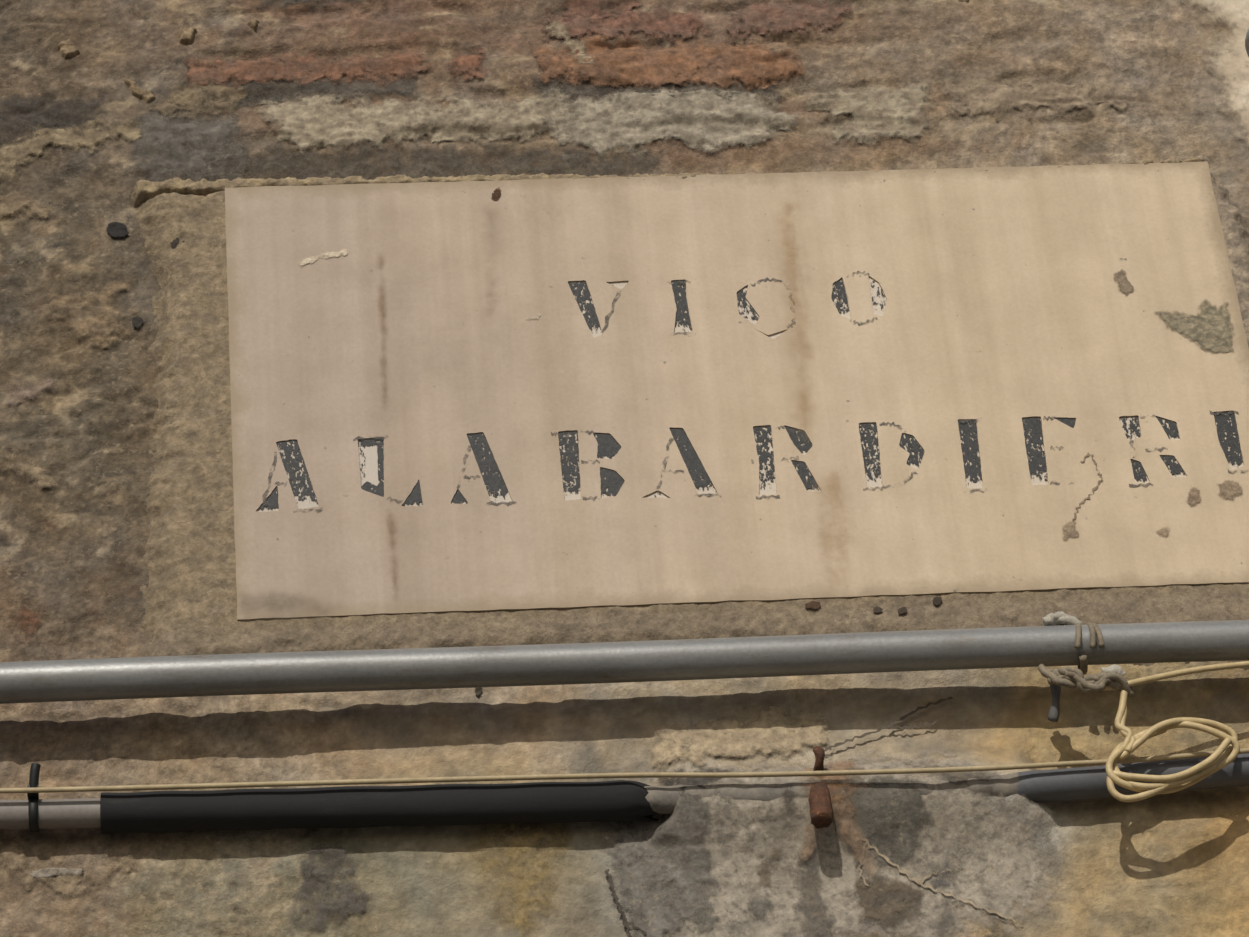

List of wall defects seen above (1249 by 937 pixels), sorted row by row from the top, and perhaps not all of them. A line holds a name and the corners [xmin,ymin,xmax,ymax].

flaking render [57,39,80,60]
flaking render [122,78,156,104]
spalling [178,27,429,107]
spalling [449,47,487,79]
spalling [533,0,853,103]
spalling [1155,300,1233,353]
crack [824,697,953,751]
rust [800,822,816,859]
peeling [604,753,1059,937]
rust [807,762,874,873]